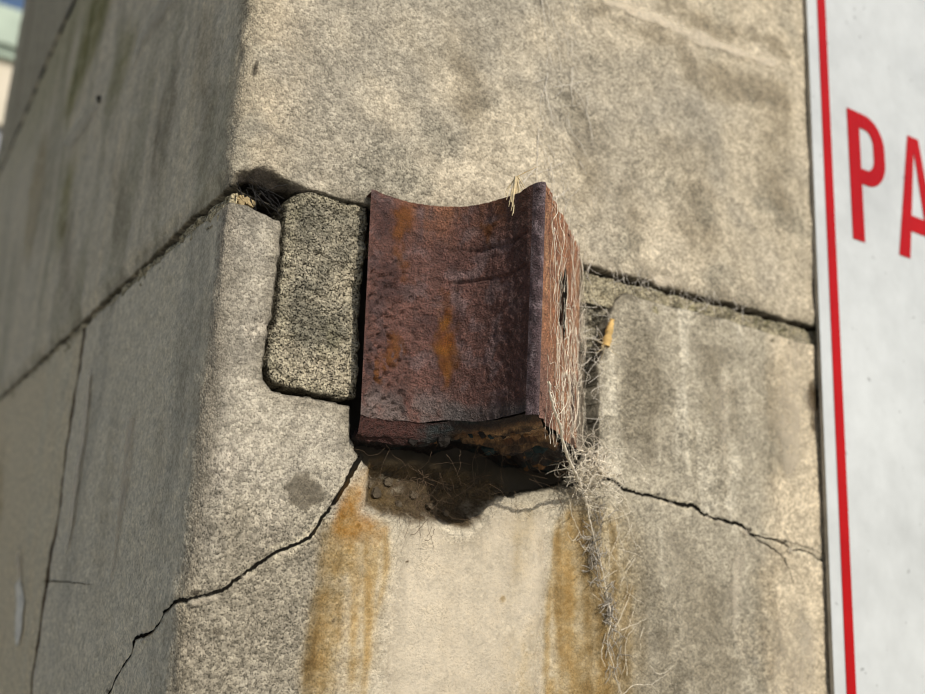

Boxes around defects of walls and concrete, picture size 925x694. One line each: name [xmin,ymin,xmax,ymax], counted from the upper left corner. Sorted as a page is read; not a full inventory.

crack [106,453,363,694]
rust [335,487,375,537]
crack [603,477,823,582]